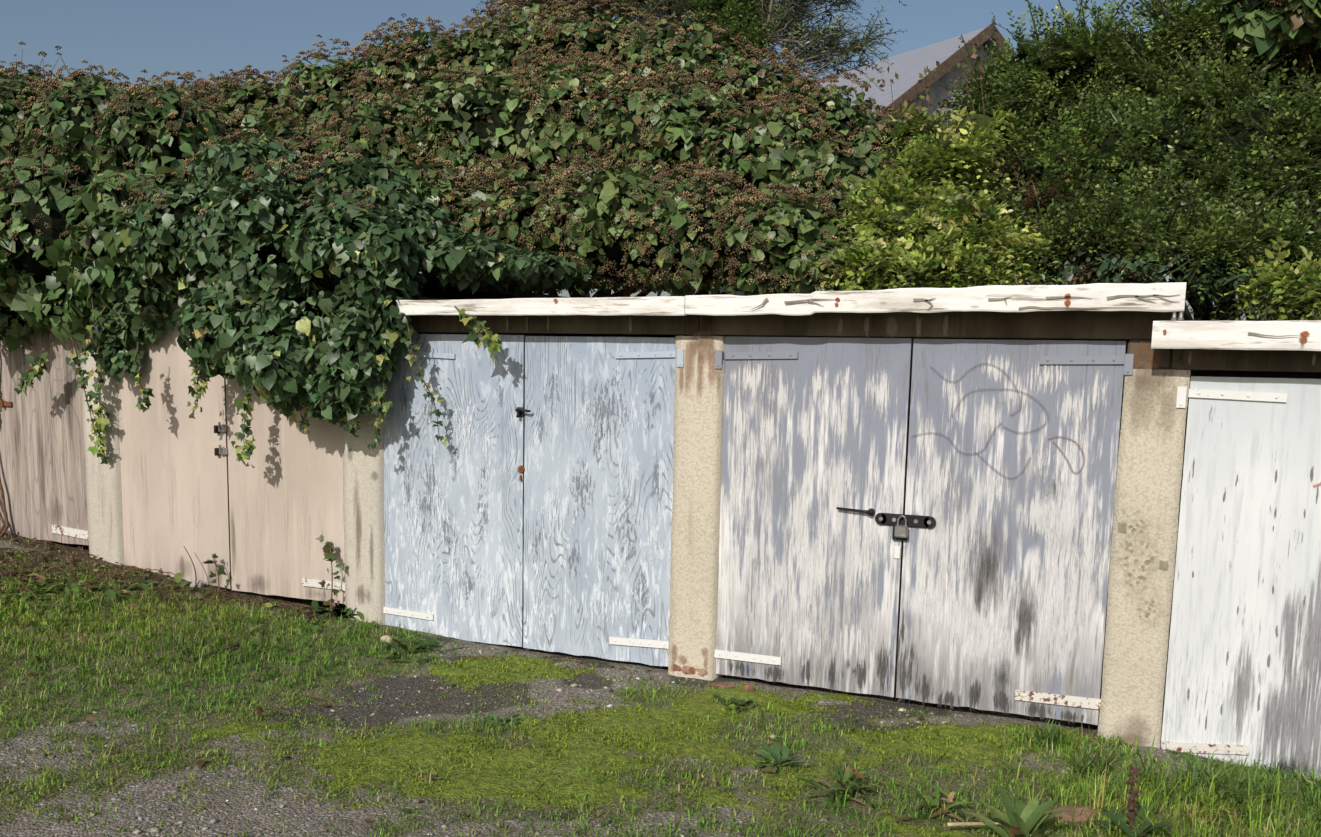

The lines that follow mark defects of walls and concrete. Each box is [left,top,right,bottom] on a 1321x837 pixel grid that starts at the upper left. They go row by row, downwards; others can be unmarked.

damp [972,533,1001,613]
damp [730,660,784,681]
damp [828,591,1037,713]
damp [1025,702,1084,723]